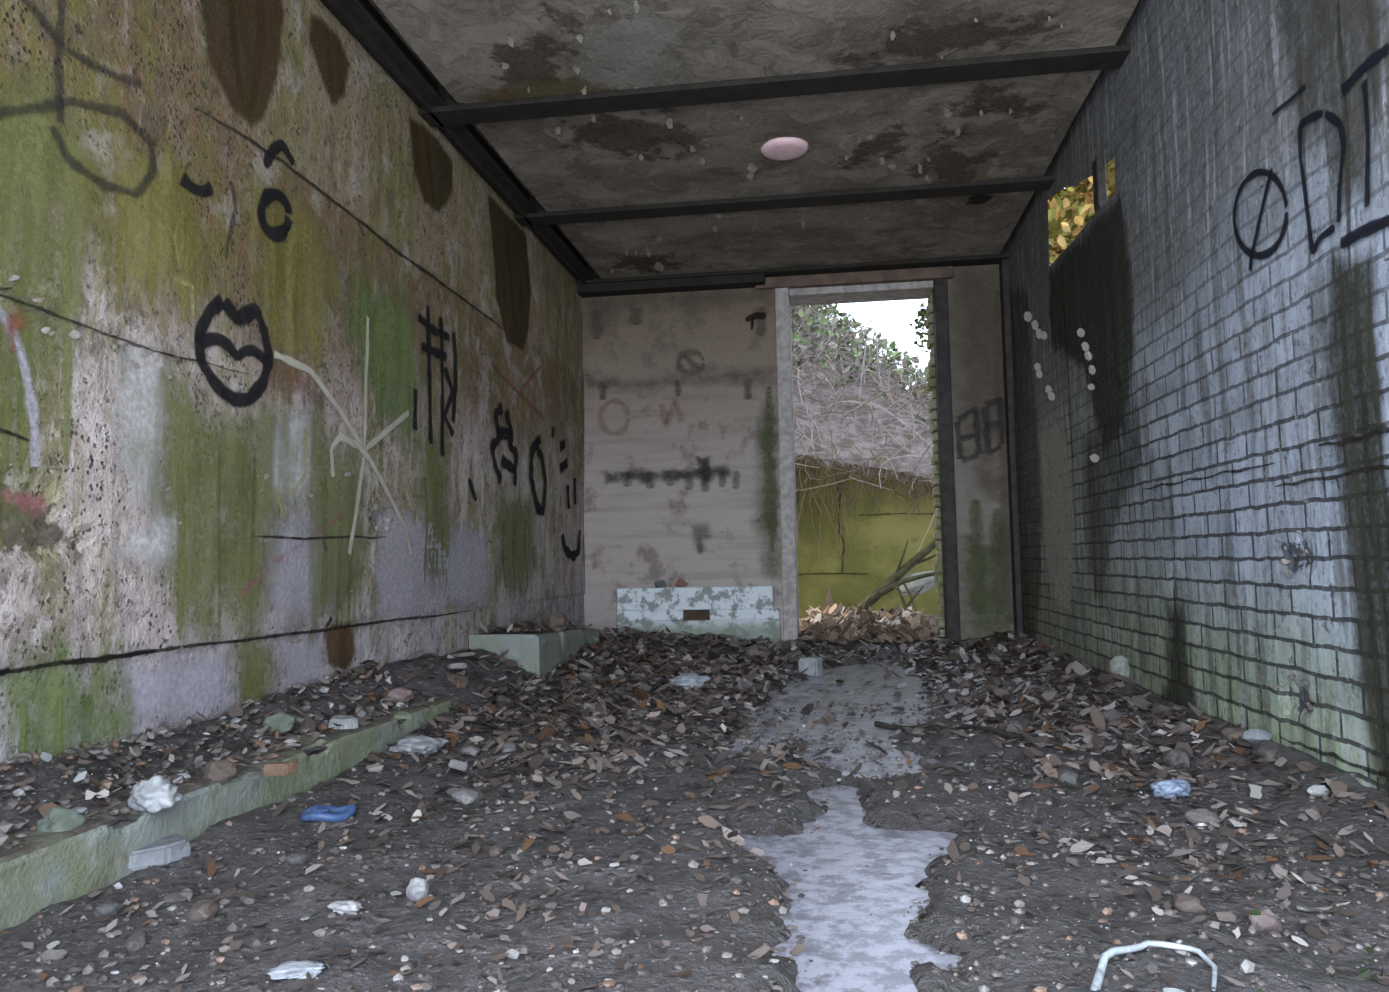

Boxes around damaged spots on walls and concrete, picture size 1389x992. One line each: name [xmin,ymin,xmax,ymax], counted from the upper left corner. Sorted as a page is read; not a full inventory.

damp [0,72,92,551]
damp [105,146,218,320]
damp [151,372,289,704]
crack [0,610,471,676]
damp [250,185,337,386]
damp [310,13,349,103]
damp [309,403,367,634]
damp [346,281,451,586]
damp [410,119,453,211]
damp [488,196,531,349]
damp [958,195,1140,636]
damp [1281,0,1389,797]